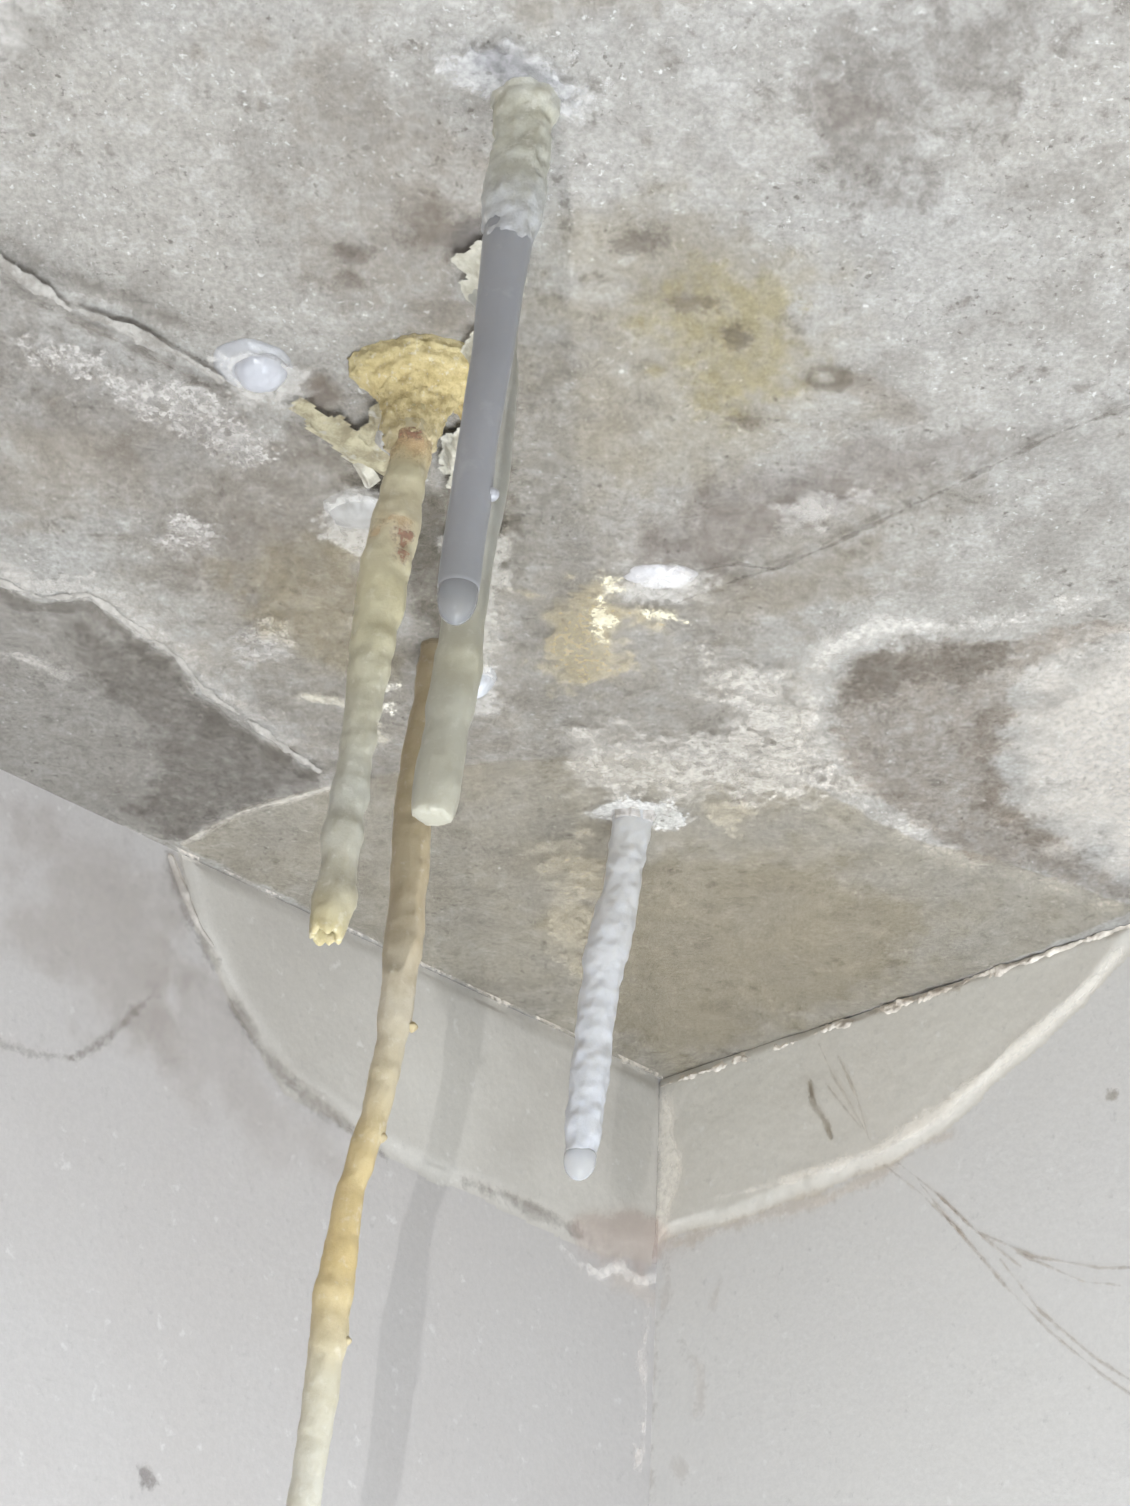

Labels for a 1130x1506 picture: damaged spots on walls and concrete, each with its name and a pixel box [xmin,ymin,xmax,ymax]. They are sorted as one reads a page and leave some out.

crack [0,254,226,384]
crack [930,436,1051,497]
crack [710,515,893,580]
peeling [0,579,322,773]